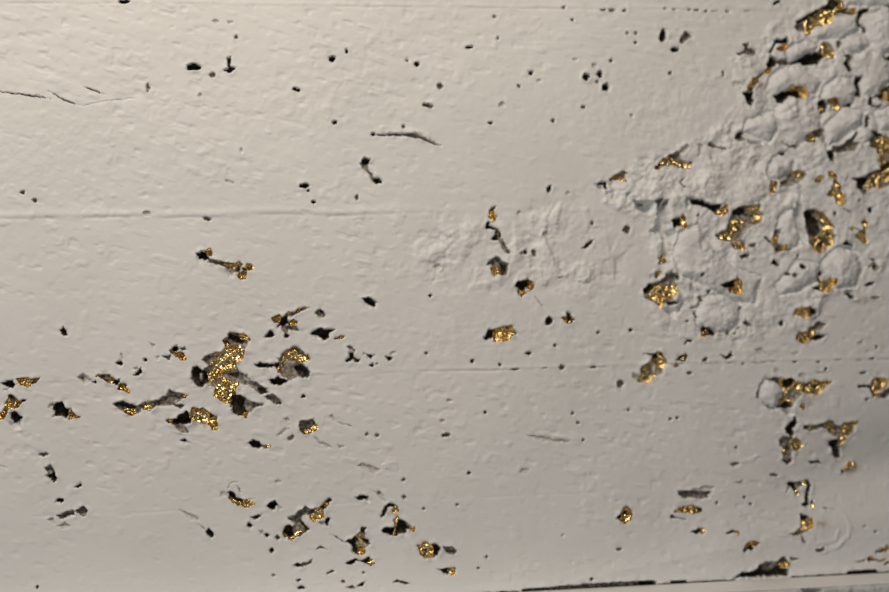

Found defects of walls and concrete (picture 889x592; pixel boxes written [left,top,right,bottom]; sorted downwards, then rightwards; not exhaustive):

spalling [582,63,609,91]
flaking render [644,0,889,337]
peeling [626,192,668,216]
peeling [77,373,115,385]
peeling [191,355,281,412]
flaking render [727,347,810,410]
peeling [114,389,185,414]
peeling [277,418,344,449]
peeling [779,436,794,461]
peeling [48,498,88,529]
peeling [277,505,326,535]
peeling [760,557,798,571]